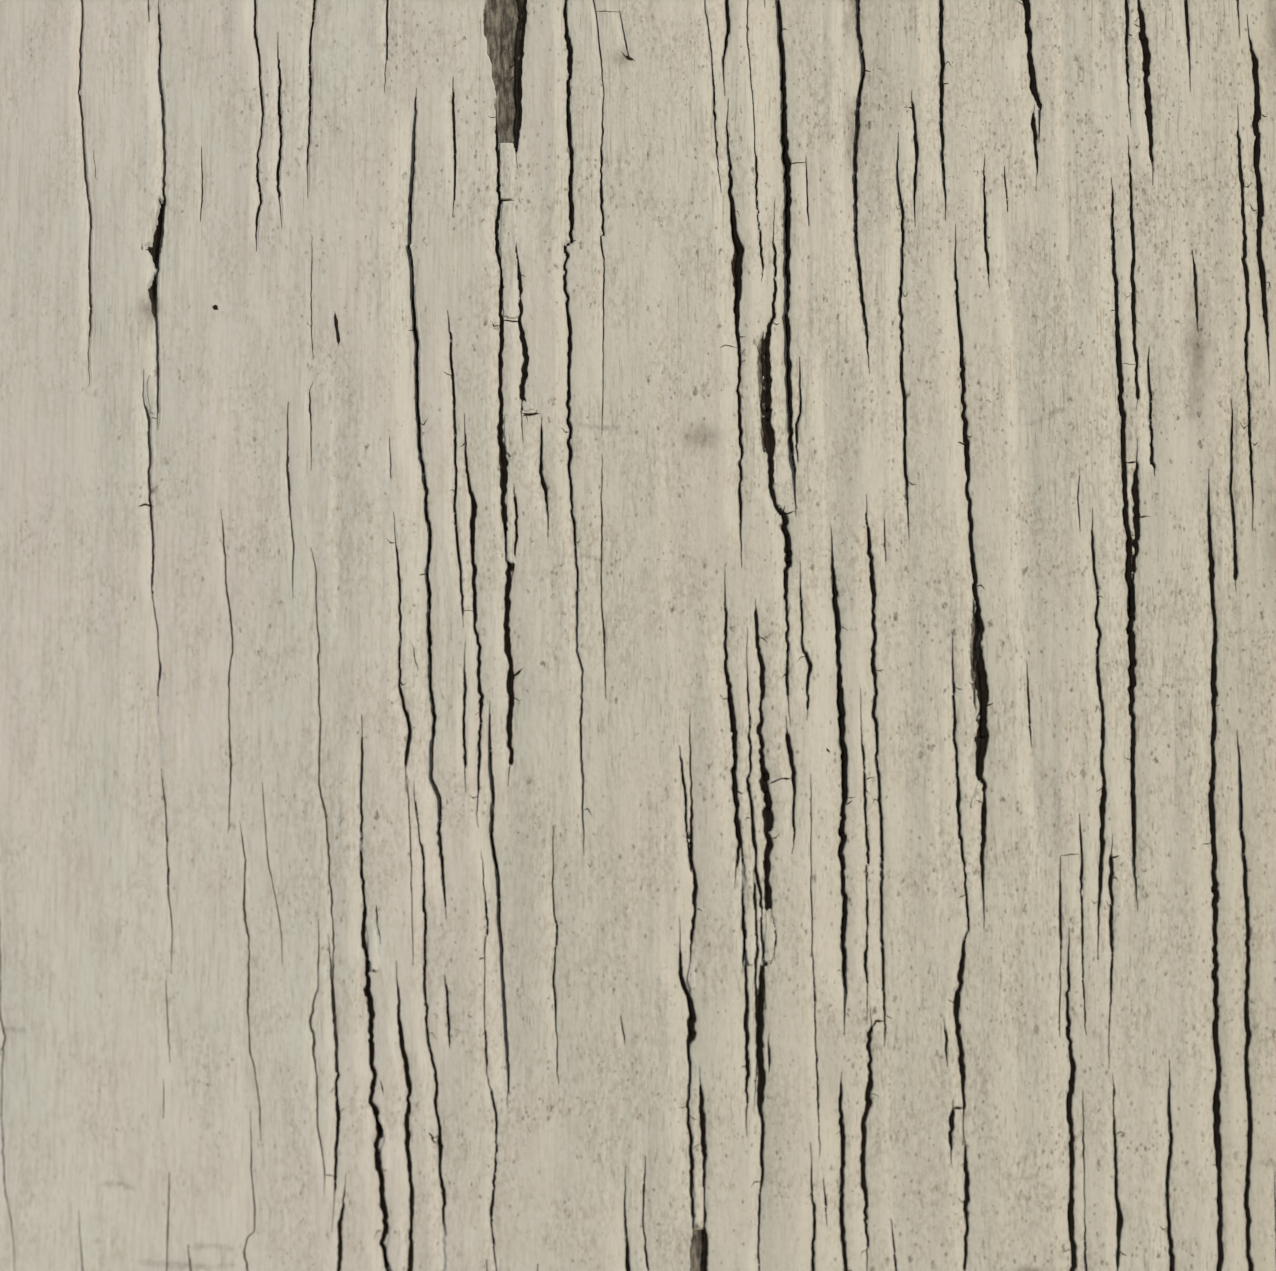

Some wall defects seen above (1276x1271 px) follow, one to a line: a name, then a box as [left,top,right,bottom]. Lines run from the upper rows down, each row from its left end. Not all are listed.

crack [138,0,169,714]
crack [221,512,283,1271]
crack [254,0,320,251]
crack [286,0,630,1271]
peeling [483,0,524,148]
crack [678,727,708,1271]
peeling [690,1227,705,1271]
crack [705,0,1008,1271]
crack [1017,0,1042,176]
crack [1059,0,1155,1271]
crack [1160,1060,1175,1271]
crack [1201,0,1276,1271]